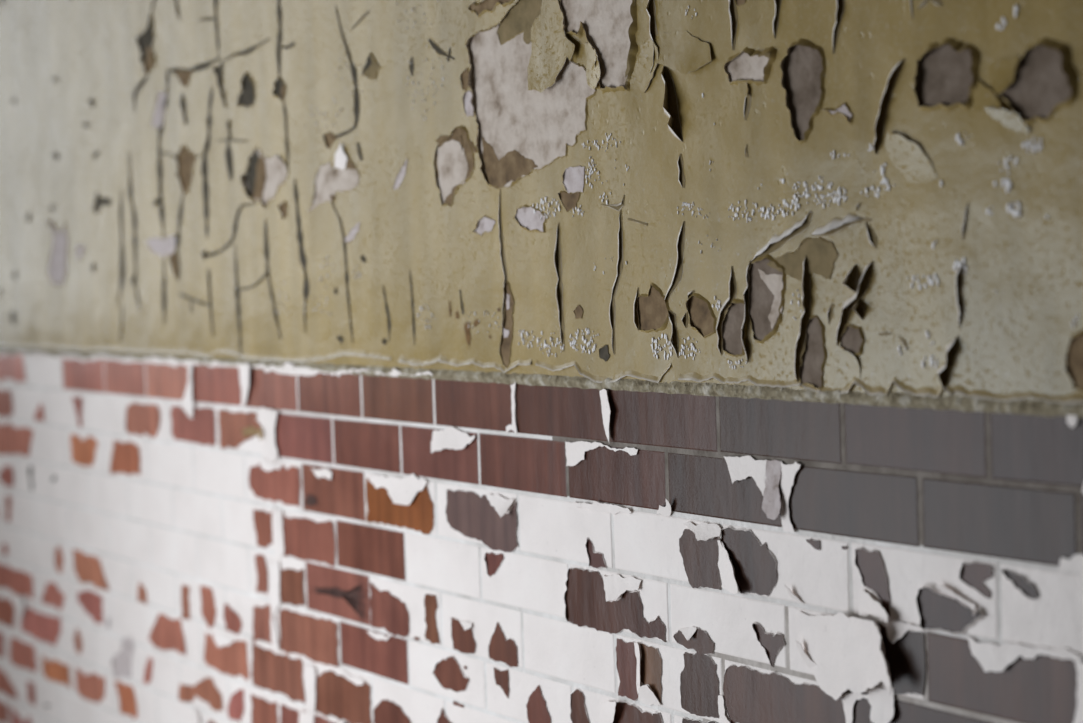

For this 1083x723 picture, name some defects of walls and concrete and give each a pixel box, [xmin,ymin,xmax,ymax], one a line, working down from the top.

crack [335,5,370,161]
crack [409,38,455,77]
flaking render [434,0,659,212]
crack [116,0,310,360]
crack [331,201,353,343]
crack [383,270,415,345]
crack [457,290,465,314]
peeling [0,350,433,723]
peeling [366,473,518,577]
peeling [367,582,518,723]
peeling [679,522,778,596]
peeling [564,537,1083,723]